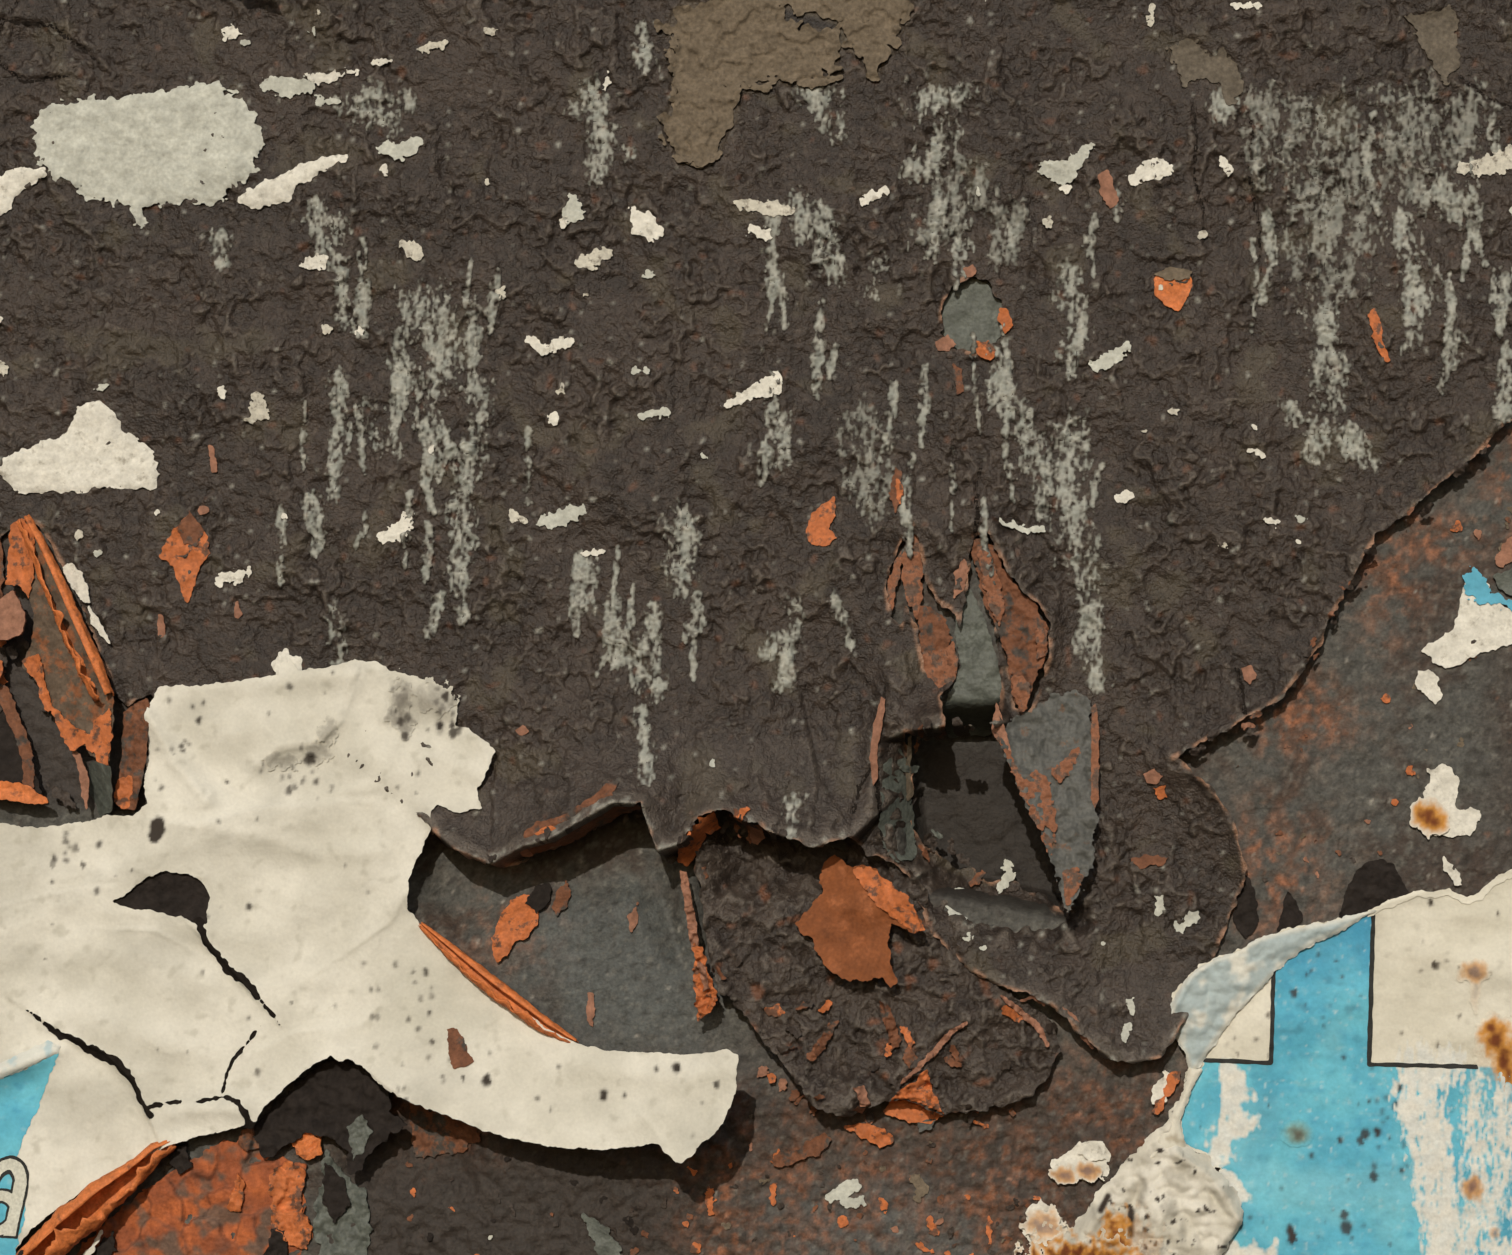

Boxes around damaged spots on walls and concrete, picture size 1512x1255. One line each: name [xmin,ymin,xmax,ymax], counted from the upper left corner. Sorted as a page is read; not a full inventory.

water stain [759,184,890,402]
water stain [897,70,1039,291]
water stain [1203,60,1512,475]
peeling [0,514,150,817]
peeling [418,880,579,1043]
water stain [567,496,709,788]
peeling [757,855,968,1206]
peeling [869,534,1100,920]
water stain [969,323,1117,698]
rust [1048,1159,1105,1184]
rust [1014,1199,1177,1255]
rust [1409,796,1450,839]